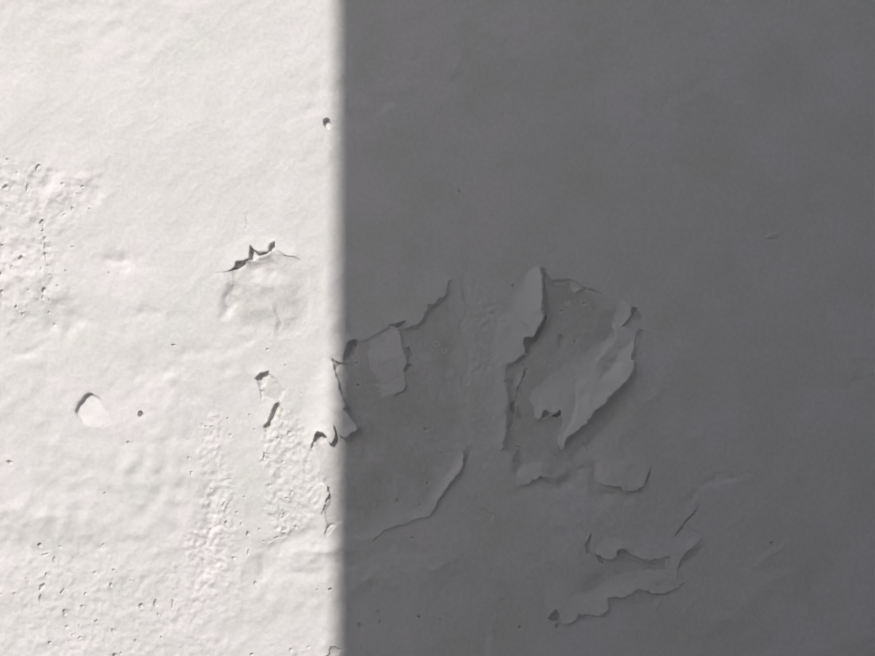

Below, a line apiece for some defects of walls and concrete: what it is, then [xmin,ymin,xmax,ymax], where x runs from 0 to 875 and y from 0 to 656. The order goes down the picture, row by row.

peeling [245,265,473,543]
peeling [483,265,646,487]